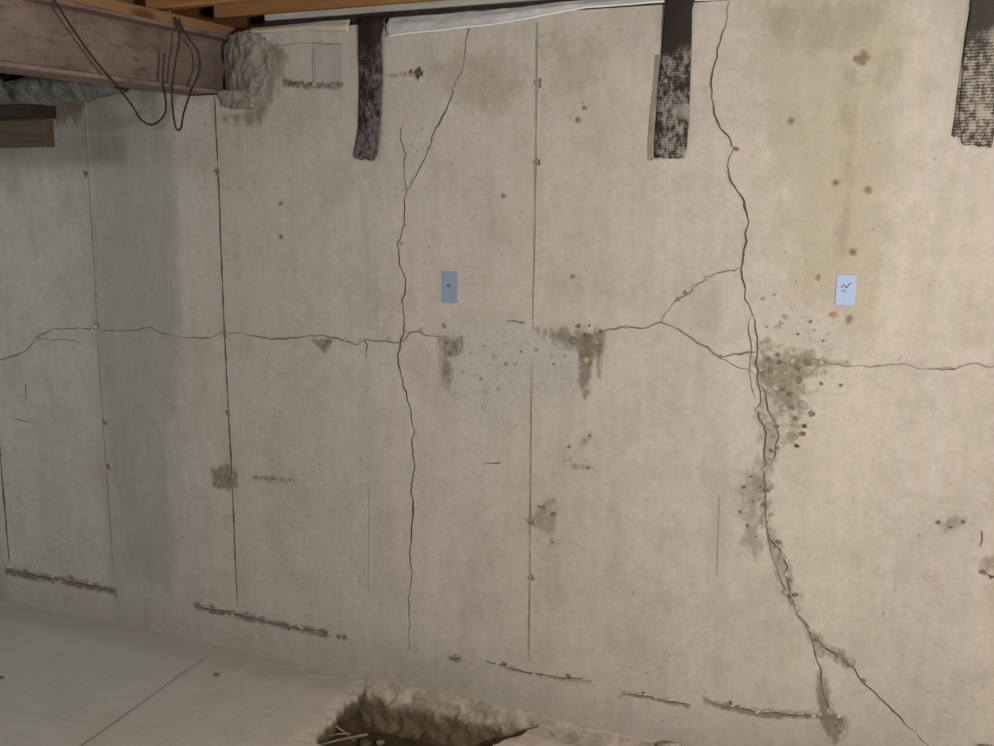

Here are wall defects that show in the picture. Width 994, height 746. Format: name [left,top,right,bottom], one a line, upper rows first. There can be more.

crack [0,28,471,654]
crack [596,1,930,746]
crack [803,356,994,371]